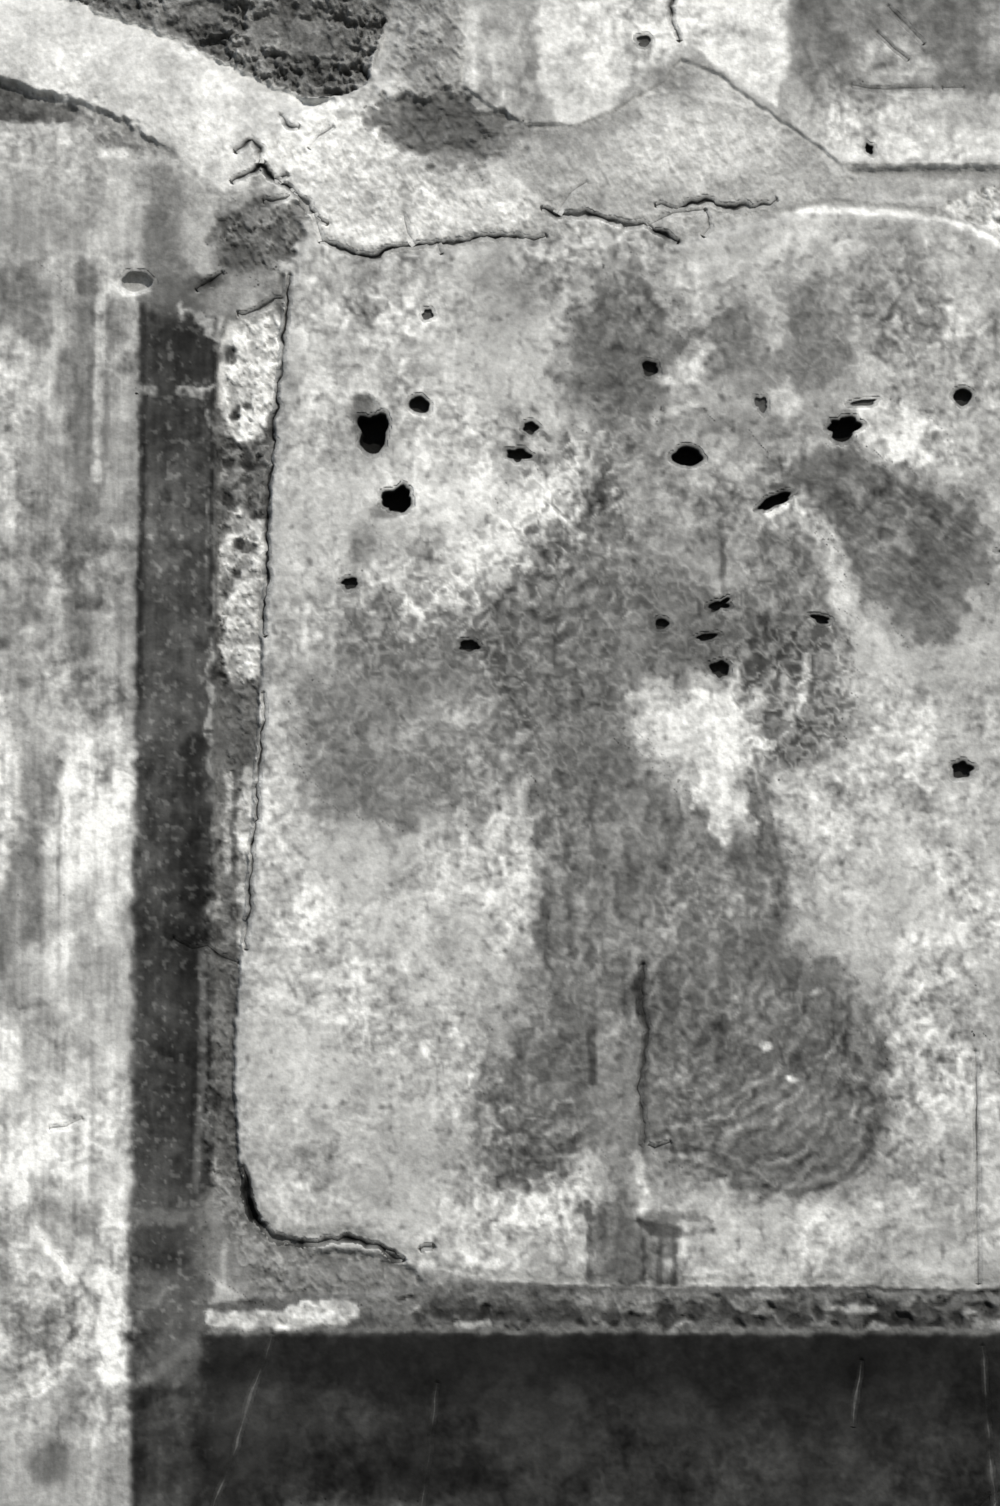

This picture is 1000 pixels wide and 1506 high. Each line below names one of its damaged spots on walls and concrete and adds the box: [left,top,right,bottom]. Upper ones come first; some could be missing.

flaking render [75,0,391,97]
crack [664,0,683,40]
peeling [850,31,932,86]
crack [852,5,963,93]
spalling [0,84,159,157]
spalling [361,87,532,181]
flaking render [943,186,1000,236]
flaking render [205,195,306,446]
spalling [346,393,379,422]
flaking render [216,500,265,689]
crack [239,1166,433,1263]
crack [979,1346,1000,1506]